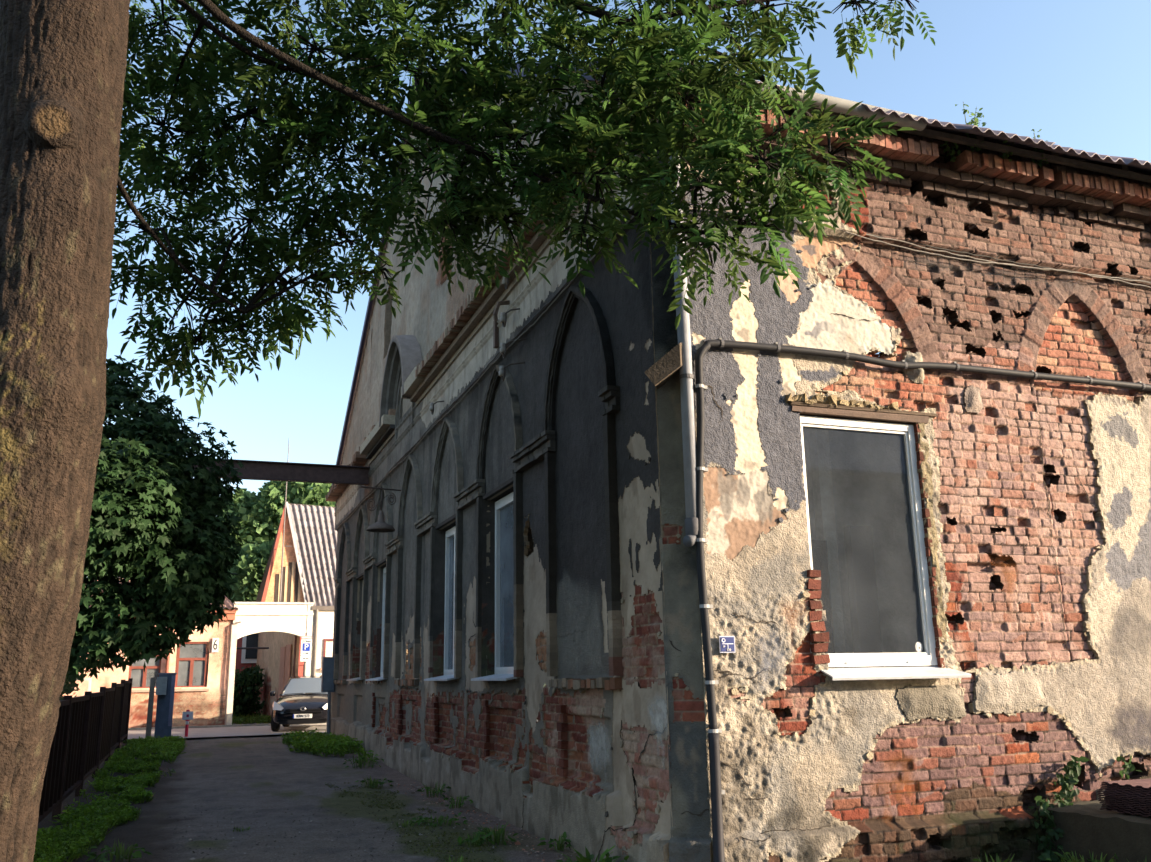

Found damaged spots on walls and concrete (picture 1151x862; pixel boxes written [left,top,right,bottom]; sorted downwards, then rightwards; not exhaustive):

spalling [833,118,1151,185]
peeling [348,432,705,841]
peeling [692,332,707,350]
peeling [703,279,790,561]
spalling [727,631,826,736]
spalling [777,180,1151,862]